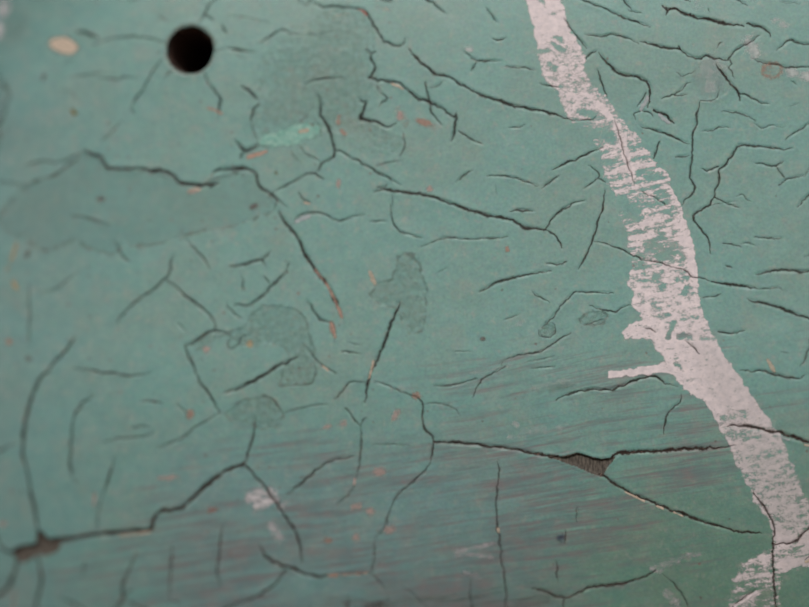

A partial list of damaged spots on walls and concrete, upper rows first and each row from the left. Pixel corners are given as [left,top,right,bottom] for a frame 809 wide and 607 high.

crack [24,0,809,354]
crack [0,254,569,607]
crack [531,561,688,607]
crack [556,375,809,607]
crack [739,349,809,379]